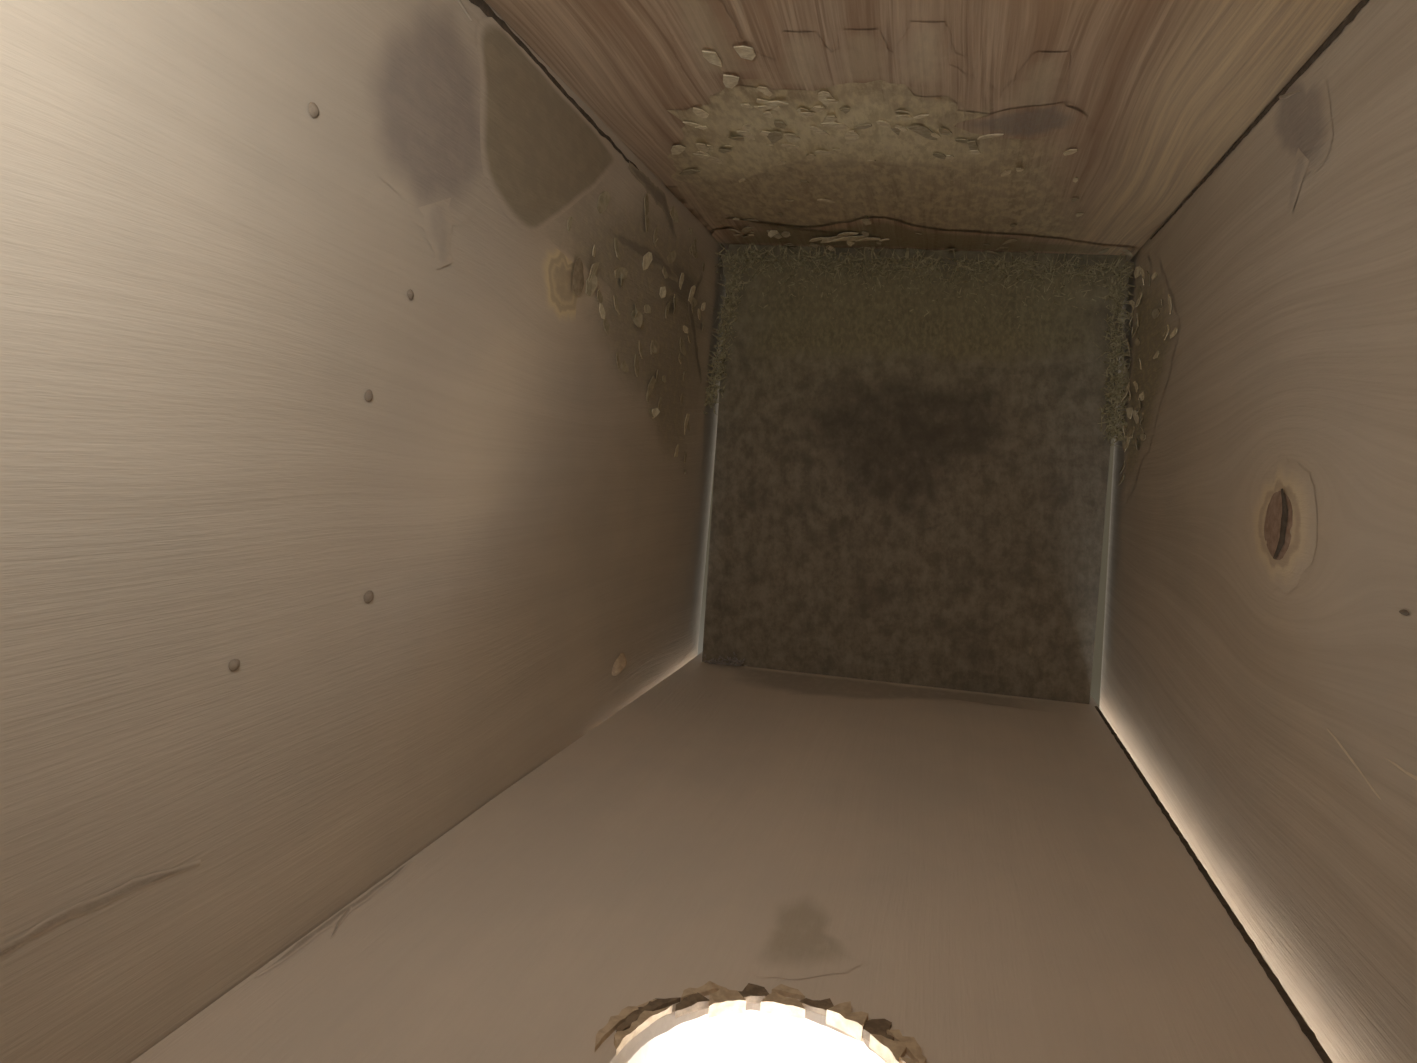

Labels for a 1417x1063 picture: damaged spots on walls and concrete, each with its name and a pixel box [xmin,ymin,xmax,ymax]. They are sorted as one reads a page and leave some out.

water stain [1270,75,1333,213]
water stain [355,0,1130,489]
water stain [764,353,1041,541]
crack [0,859,201,959]